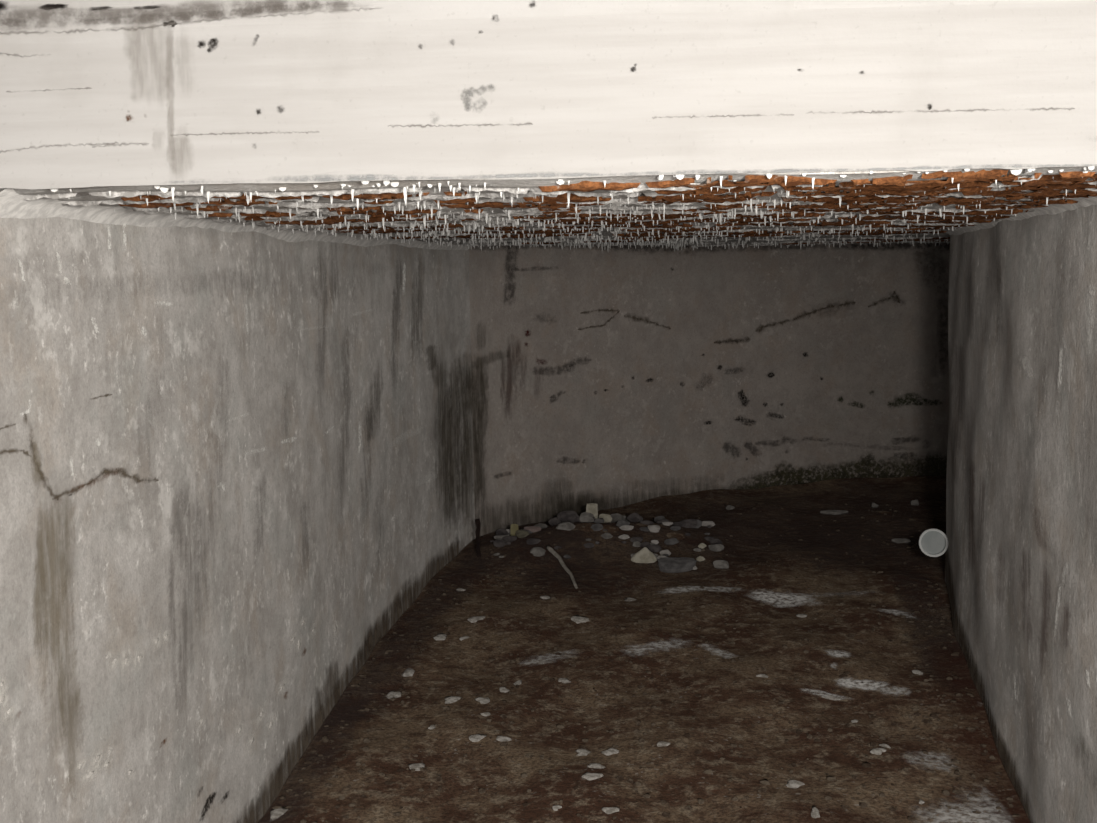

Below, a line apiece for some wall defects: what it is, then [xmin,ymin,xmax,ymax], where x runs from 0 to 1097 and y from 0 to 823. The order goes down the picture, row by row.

damp [23,165,1097,297]
crack [0,417,159,500]
damp [437,368,486,510]